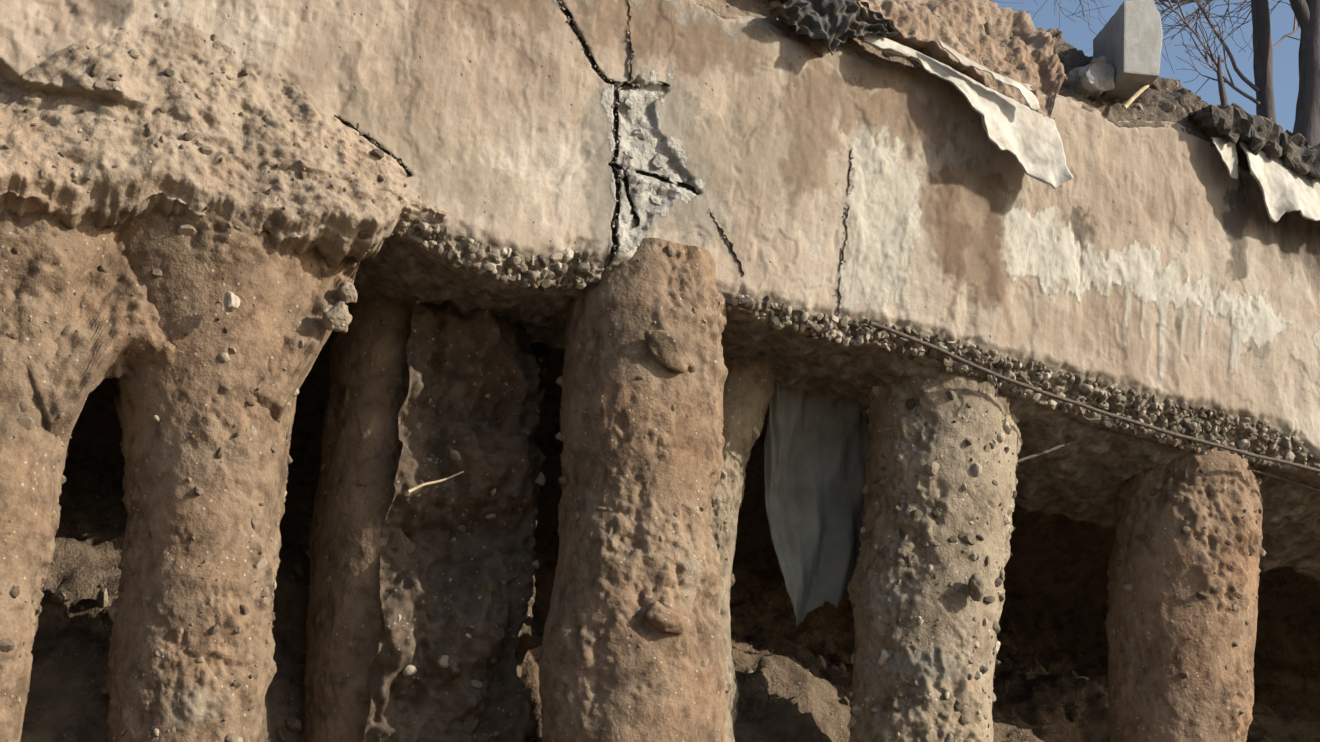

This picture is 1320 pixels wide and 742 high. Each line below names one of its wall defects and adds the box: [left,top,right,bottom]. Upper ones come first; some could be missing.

crack [334,115,412,177]
spalling [390,216,594,292]
damp [582,67,624,261]
crack [556,0,744,276]
spalling [601,70,705,257]
damp [642,68,832,248]
crack [835,148,854,316]
peeling [862,30,1073,189]
damp [838,123,1320,378]
peeling [1211,137,1320,222]